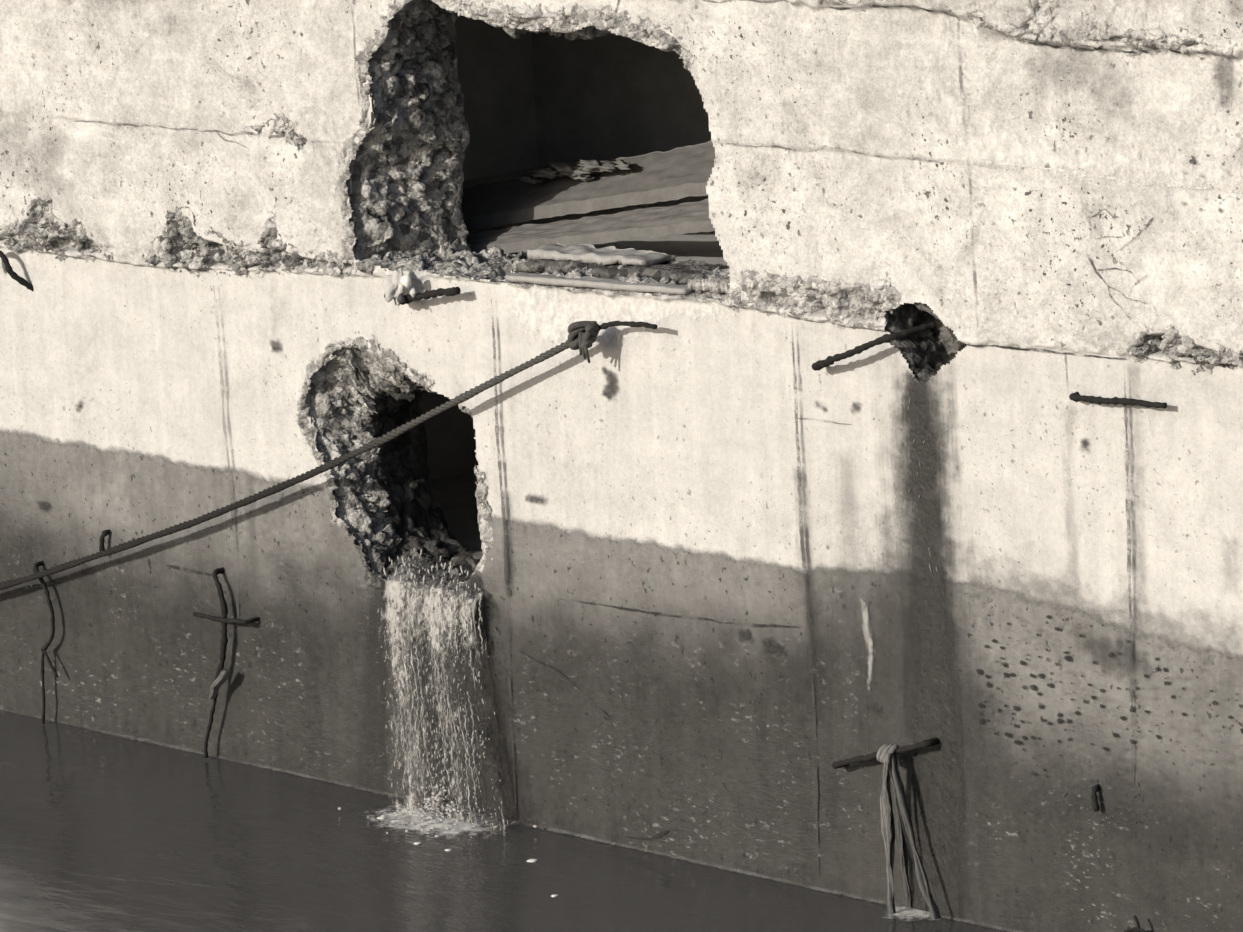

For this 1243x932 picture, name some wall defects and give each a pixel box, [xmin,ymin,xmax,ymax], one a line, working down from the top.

spalling [0,194,113,262]
spalling [295,334,495,598]
spalling [142,0,967,383]
spalling [1126,325,1243,375]
damp [0,371,1243,932]